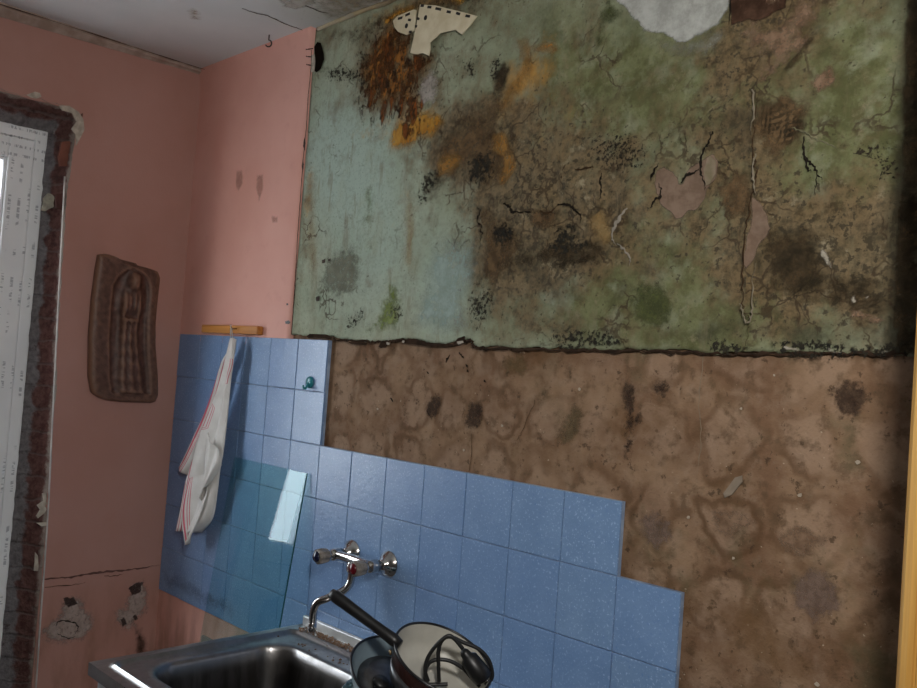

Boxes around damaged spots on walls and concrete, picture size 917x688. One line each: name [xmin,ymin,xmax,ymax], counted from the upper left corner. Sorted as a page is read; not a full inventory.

flaking render [601,0,786,50]
damp [418,54,511,205]
crack [503,203,581,228]
crack [561,165,602,199]
peeling [650,131,718,219]
damp [754,96,806,153]
crack [792,127,838,195]
damp [851,0,917,354]
damp [766,234,882,322]
spalling [0,78,96,688]
peeling [306,327,911,372]
crack [42,565,157,588]